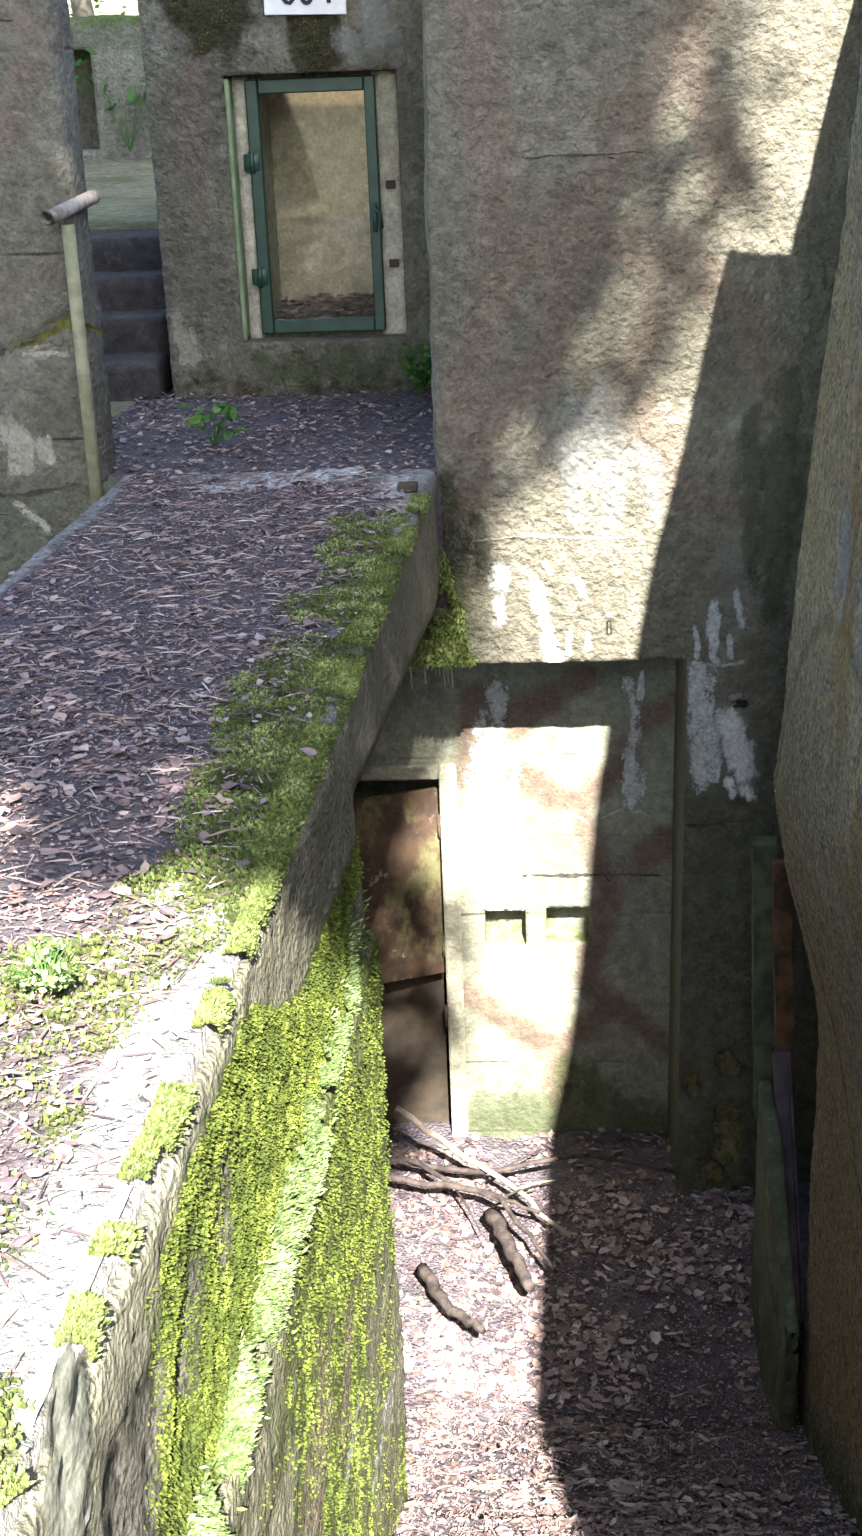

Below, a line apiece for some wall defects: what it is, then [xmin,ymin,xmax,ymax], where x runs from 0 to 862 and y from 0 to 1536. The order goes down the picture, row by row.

water stain [459,668,534,911]
water stain [488,560,592,663]
water stain [621,670,649,811]
water stain [687,589,746,795]